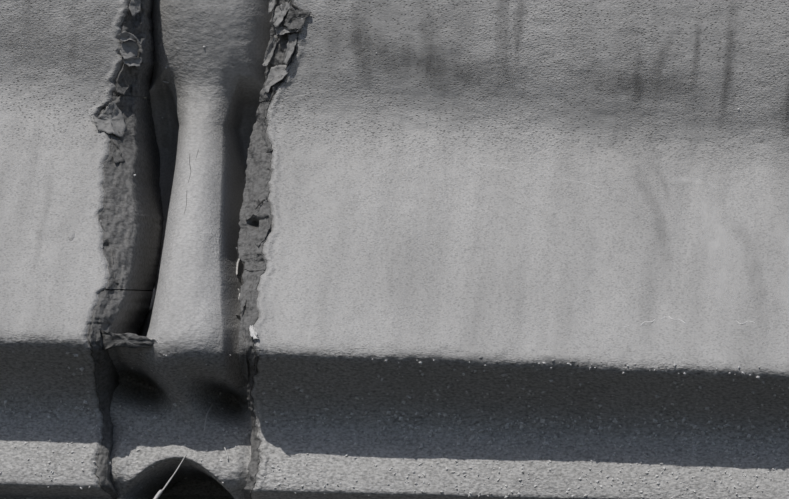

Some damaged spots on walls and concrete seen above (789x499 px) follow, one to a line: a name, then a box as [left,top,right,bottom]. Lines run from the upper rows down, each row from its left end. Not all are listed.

spalling [87,0,164,499]
spalling [237,0,310,499]